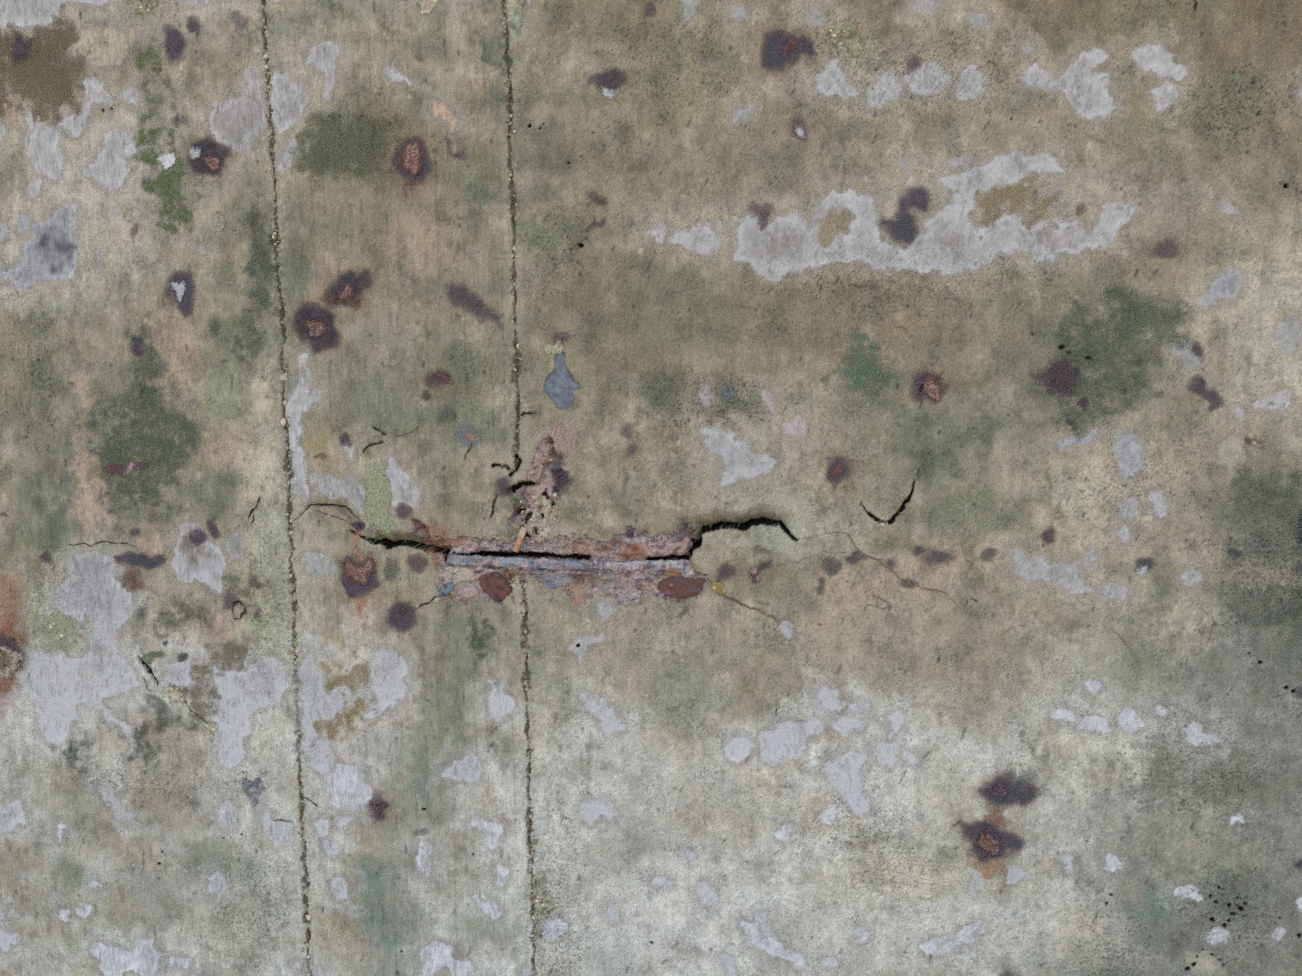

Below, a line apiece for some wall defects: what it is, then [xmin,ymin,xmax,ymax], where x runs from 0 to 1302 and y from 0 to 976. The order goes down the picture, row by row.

rust [188,139,229,176]
rust [392,138,466,196]
rust [294,271,370,352]
rust [913,372,943,402]
crack [363,417,426,452]
rust [341,532,379,615]
crack [293,503,590,560]
crack [464,442,535,518]
spalling [280,341,726,663]
crack [646,481,978,624]
rust [0,577,23,705]
rust [955,772,1037,879]